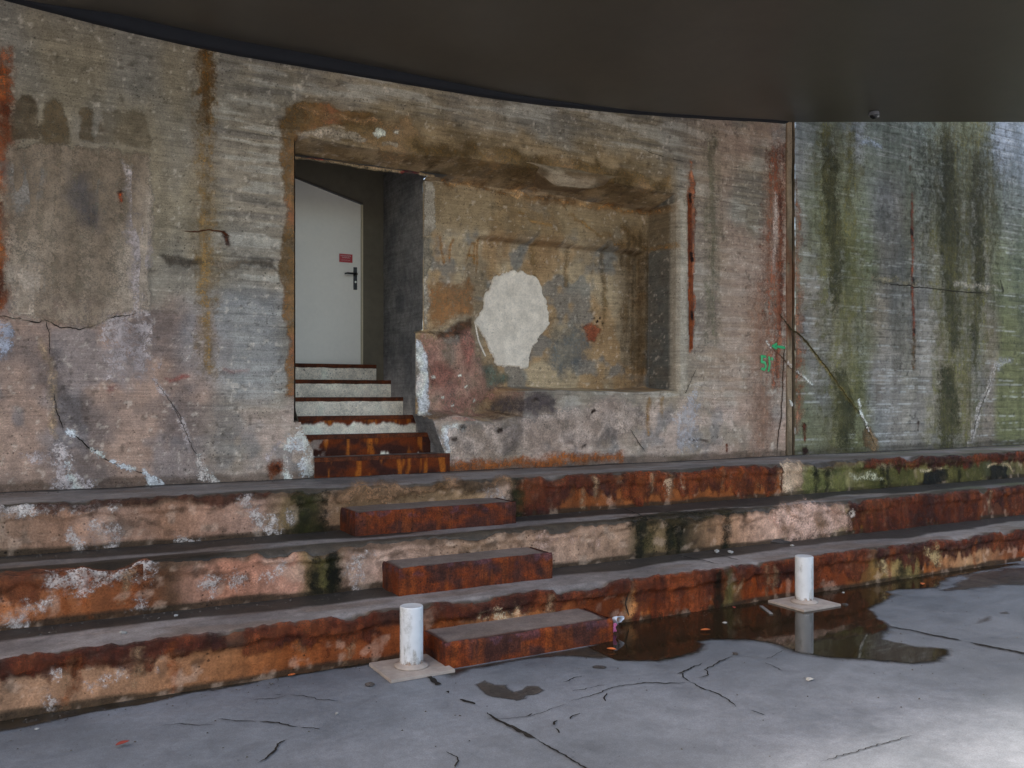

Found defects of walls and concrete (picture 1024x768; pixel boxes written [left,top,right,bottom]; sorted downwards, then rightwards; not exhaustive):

crack [181,229,231,246]
damp [278,101,670,396]
rust [687,161,697,352]
damp [940,126,985,365]
spalling [421,319,646,457]
damp [27,440,94,490]
crack [54,395,164,485]
rust [450,450,778,516]
damp [47,561,151,597]
rust [813,529,1024,586]
rust [0,632,226,689]
crack [489,657,764,733]